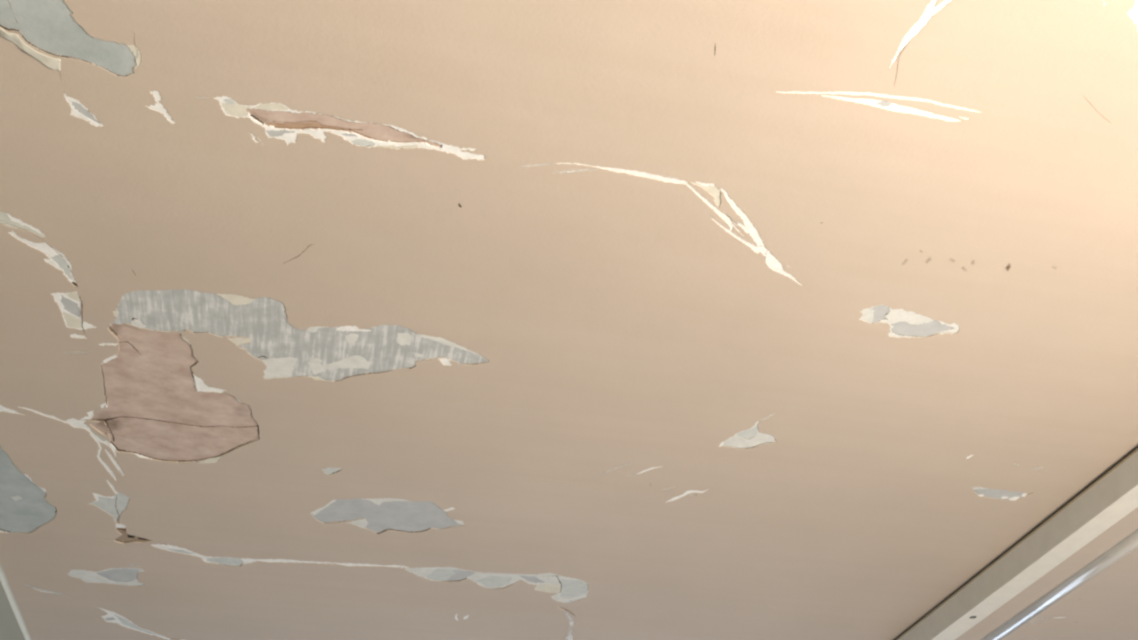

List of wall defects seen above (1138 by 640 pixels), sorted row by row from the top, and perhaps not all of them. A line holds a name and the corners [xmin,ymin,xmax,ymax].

crack [1102,0,1138,28]
peeling [0,0,141,76]
crack [777,0,983,122]
peeling [64,94,104,127]
spalling [214,96,486,160]
crack [525,163,802,285]
peeling [0,212,489,464]
peeling [860,305,959,338]
peeling [719,415,777,449]
peeling [311,498,465,534]
peeling [404,567,589,603]
crack [98,607,181,640]